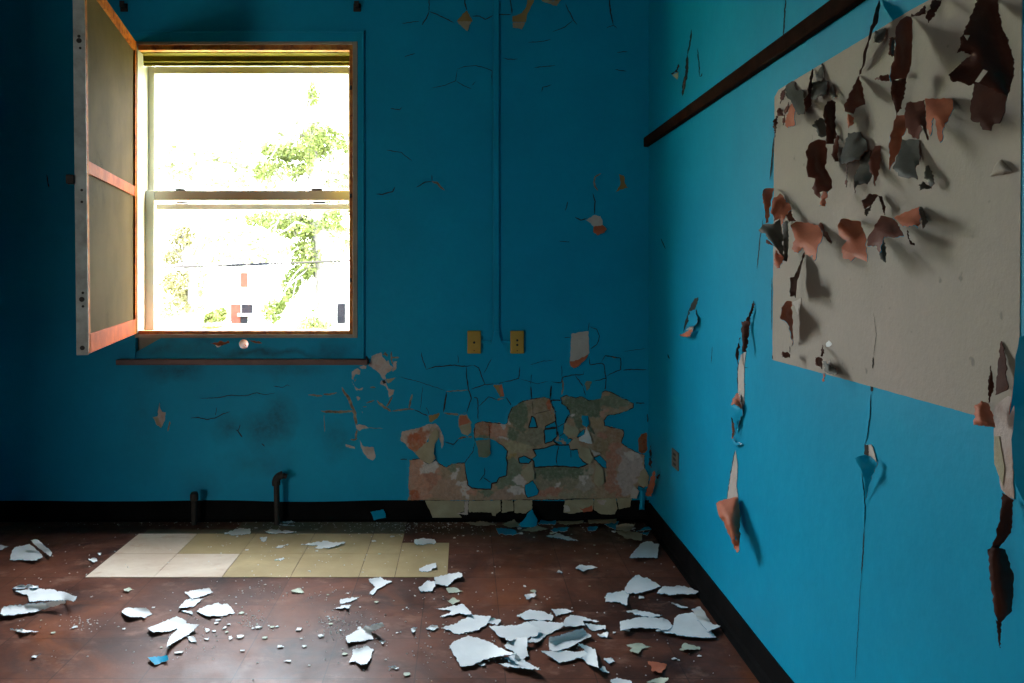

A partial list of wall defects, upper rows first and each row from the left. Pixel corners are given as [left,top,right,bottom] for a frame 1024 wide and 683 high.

crack [402,0,577,90]
peeling [575,195,607,235]
peeling [680,298,698,337]
peeling [759,0,1024,677]
peeling [152,402,170,430]
crack [190,385,289,446]
flaking render [309,351,399,462]
peeling [398,325,660,541]
crack [393,348,670,445]
peeling [716,301,755,553]